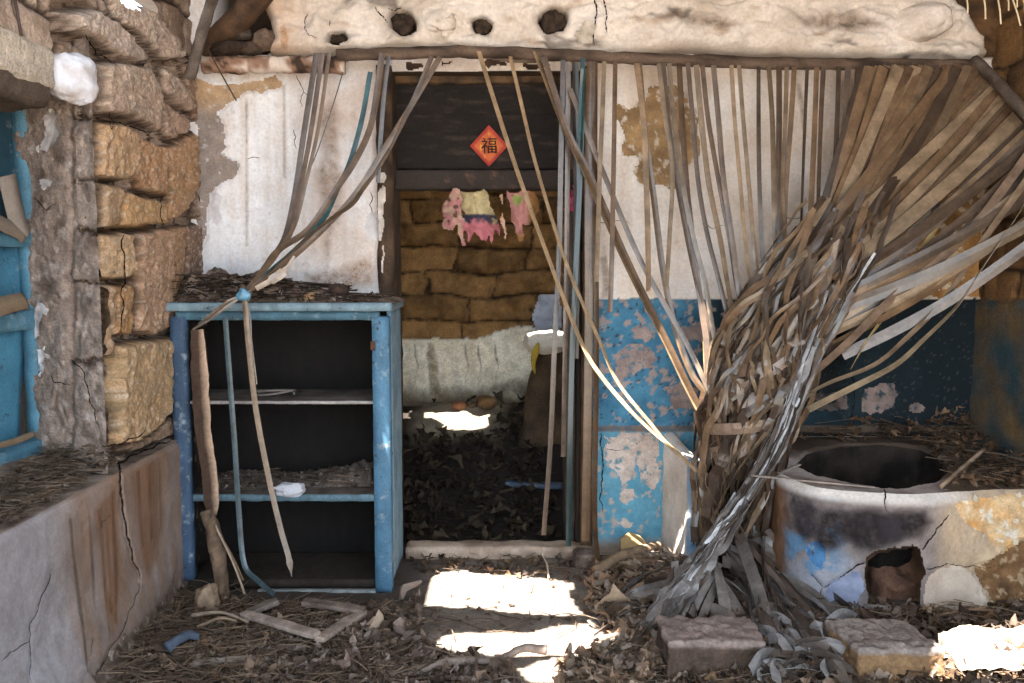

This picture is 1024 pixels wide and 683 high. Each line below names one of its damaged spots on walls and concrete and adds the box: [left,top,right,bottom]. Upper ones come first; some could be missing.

peeling [195,75,282,242]
spalling [617,83,700,189]
crack [119,235,127,335]
peeling [615,324,657,380]
peeling [663,380,699,410]
peeling [862,383,898,415]
peeling [909,403,925,413]
peeling [603,433,661,505]
crack [1,574,51,680]
crack [51,360,172,680]
crack [812,562,865,594]
peeling [923,492,1024,610]